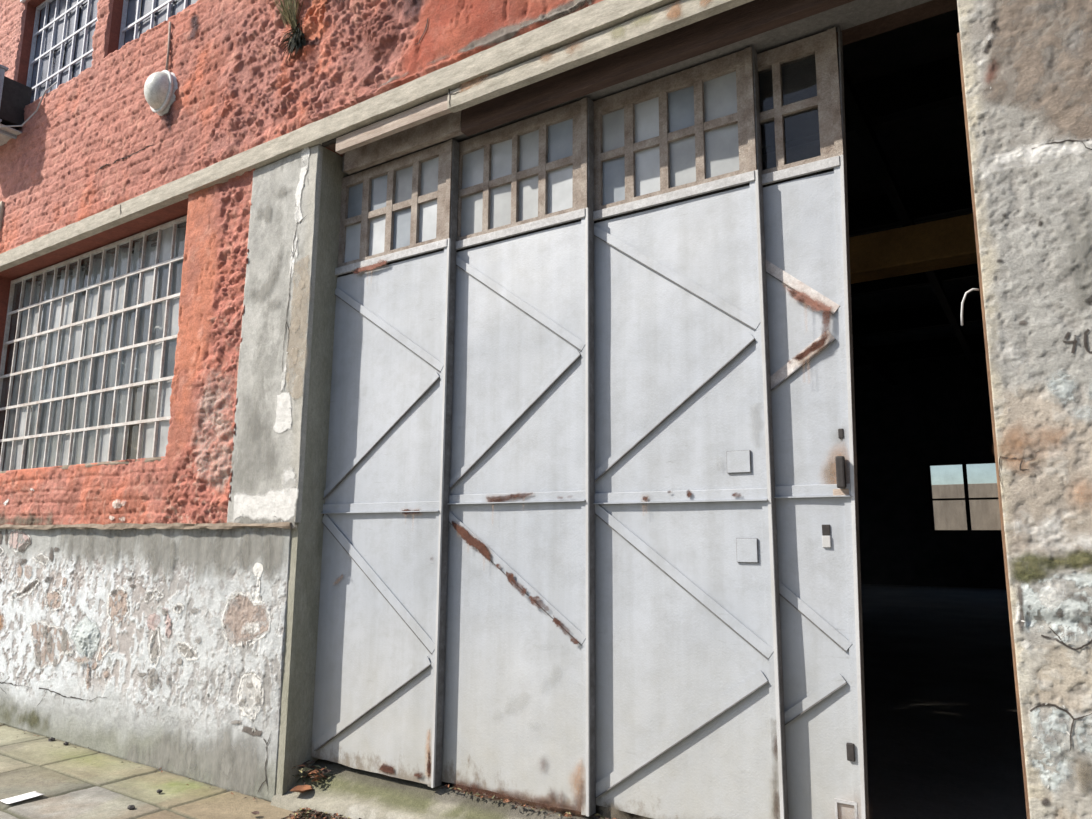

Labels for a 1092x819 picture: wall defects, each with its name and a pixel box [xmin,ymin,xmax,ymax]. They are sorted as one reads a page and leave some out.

spalling [273,236,310,433]
crack [282,204,307,380]
rust [353,260,387,274]
rust [788,289,831,363]
peeling [233,467,298,522]
rust [487,493,532,502]
peeling [0,529,75,669]
peeling [85,577,201,690]
rust [452,521,579,644]
crack [1041,627,1092,650]
crack [0,678,107,706]
crack [1030,703,1092,752]